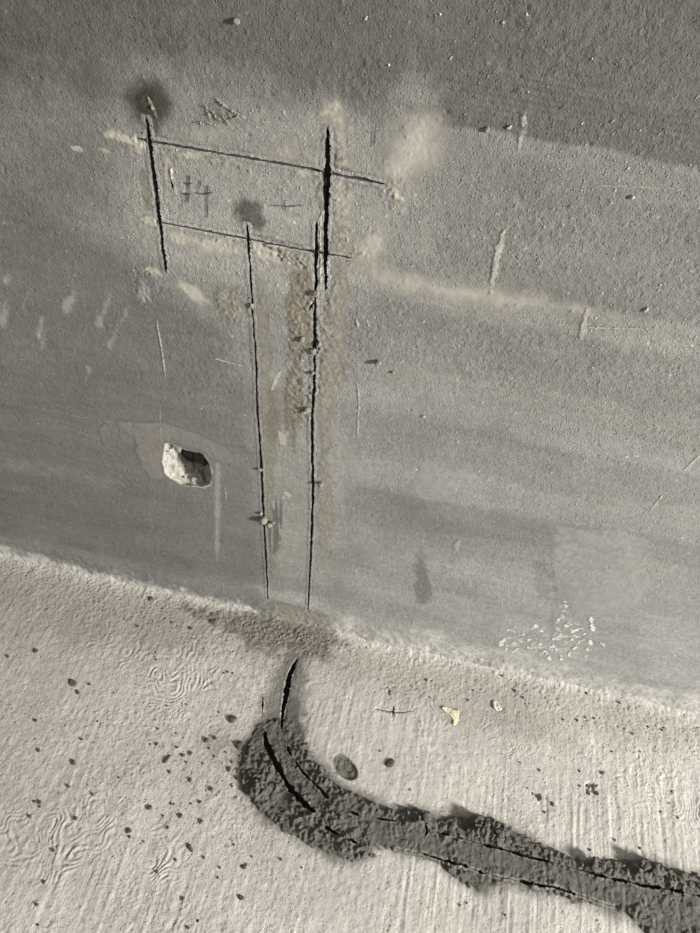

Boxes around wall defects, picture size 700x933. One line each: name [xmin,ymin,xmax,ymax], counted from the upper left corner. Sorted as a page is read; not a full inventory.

spalling [161,442,213,488]
crack [134,114,386,611]
crack [259,657,700,911]
damp [333,615,700,713]